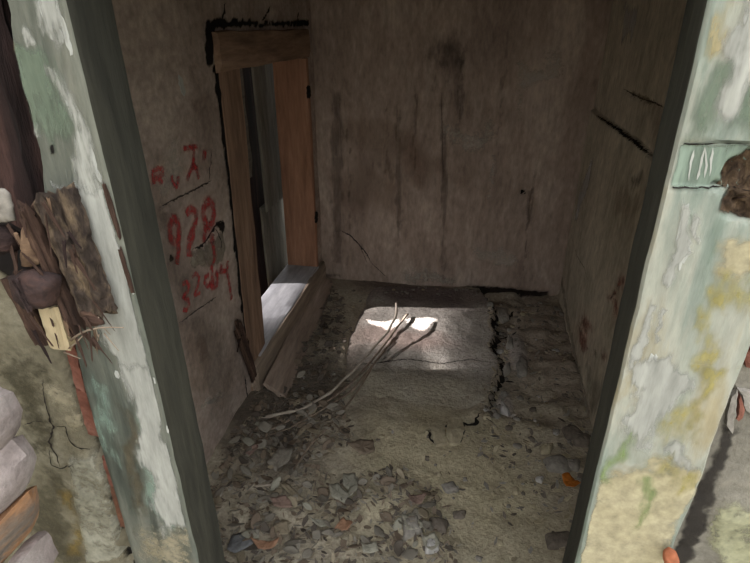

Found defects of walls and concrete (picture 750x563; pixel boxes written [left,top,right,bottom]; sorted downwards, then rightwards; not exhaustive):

spalling [190,4,309,343]
crack [598,116,652,156]
crack [626,90,663,108]
peeling [48,68,185,532]
crack [25,383,87,469]
crack [366,307,516,444]
peeling [622,305,695,449]
spalling [69,437,135,563]